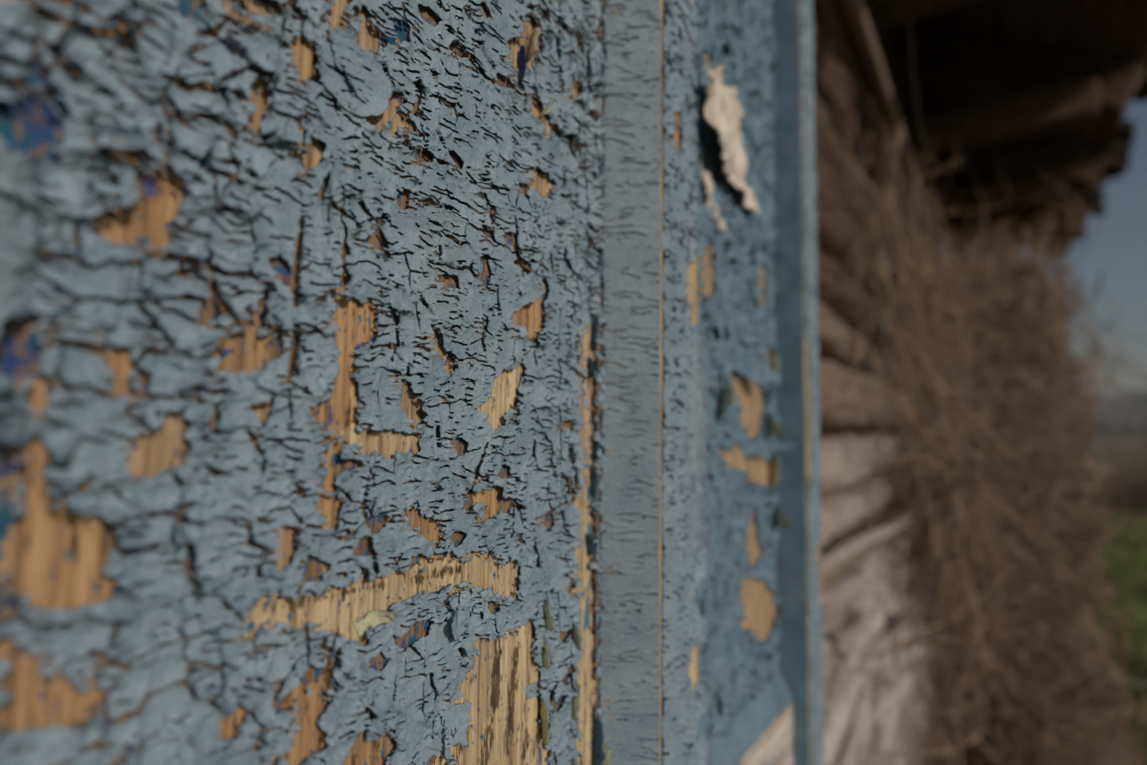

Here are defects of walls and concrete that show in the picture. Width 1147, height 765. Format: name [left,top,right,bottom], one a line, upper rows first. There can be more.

crack [101,59,223,142]
peeling [163,0,425,149]
crack [450,41,534,99]
peeling [500,16,605,236]
peeling [77,143,214,260]
crack [175,263,281,303]
crack [331,180,356,292]
crack [423,146,550,273]
peeling [0,310,128,758]
peeling [76,259,612,765]
crack [463,434,493,498]
peeling [677,233,814,721]